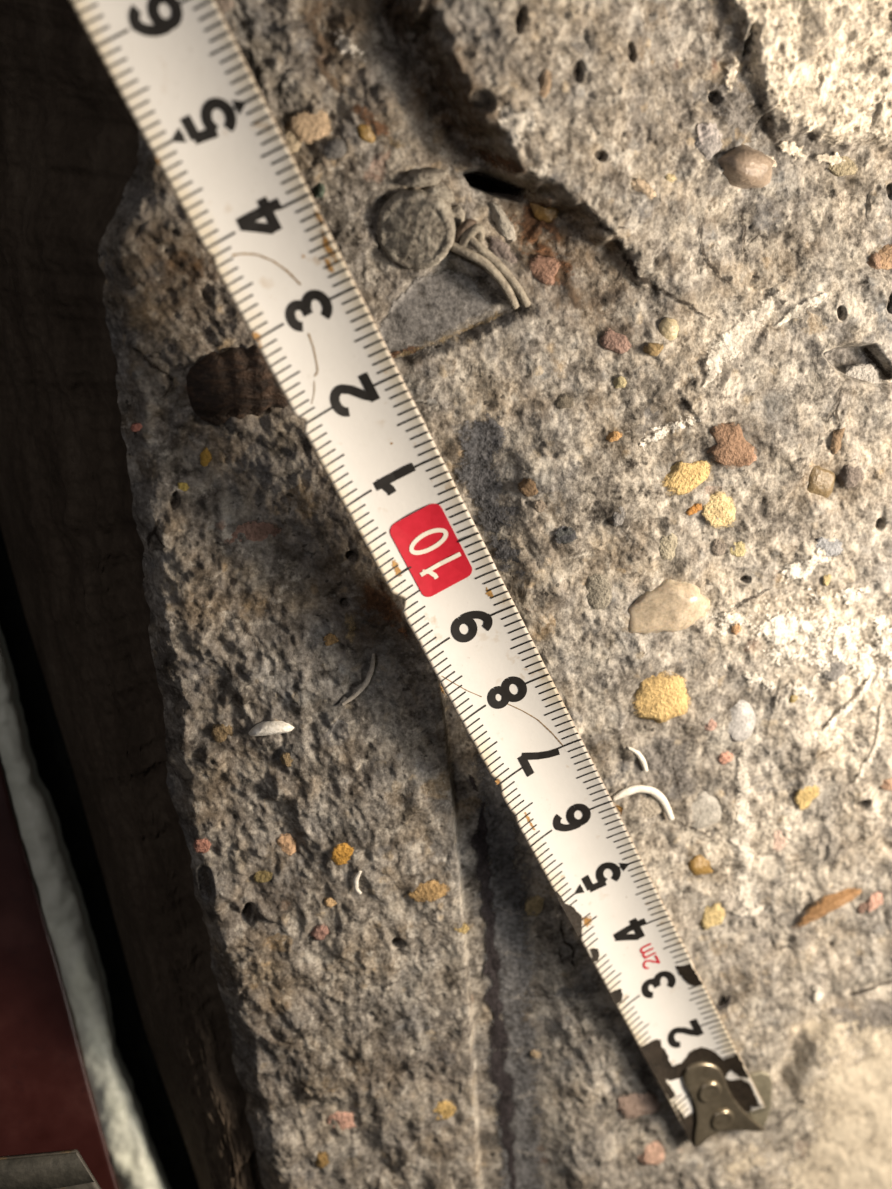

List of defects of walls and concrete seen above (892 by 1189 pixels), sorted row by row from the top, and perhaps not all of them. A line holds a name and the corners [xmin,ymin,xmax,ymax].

crack [497,90,536,165]
crack [492,221,530,272]
crack [580,196,712,320]
crack [700,214,758,285]
crack [468,774,517,1189]